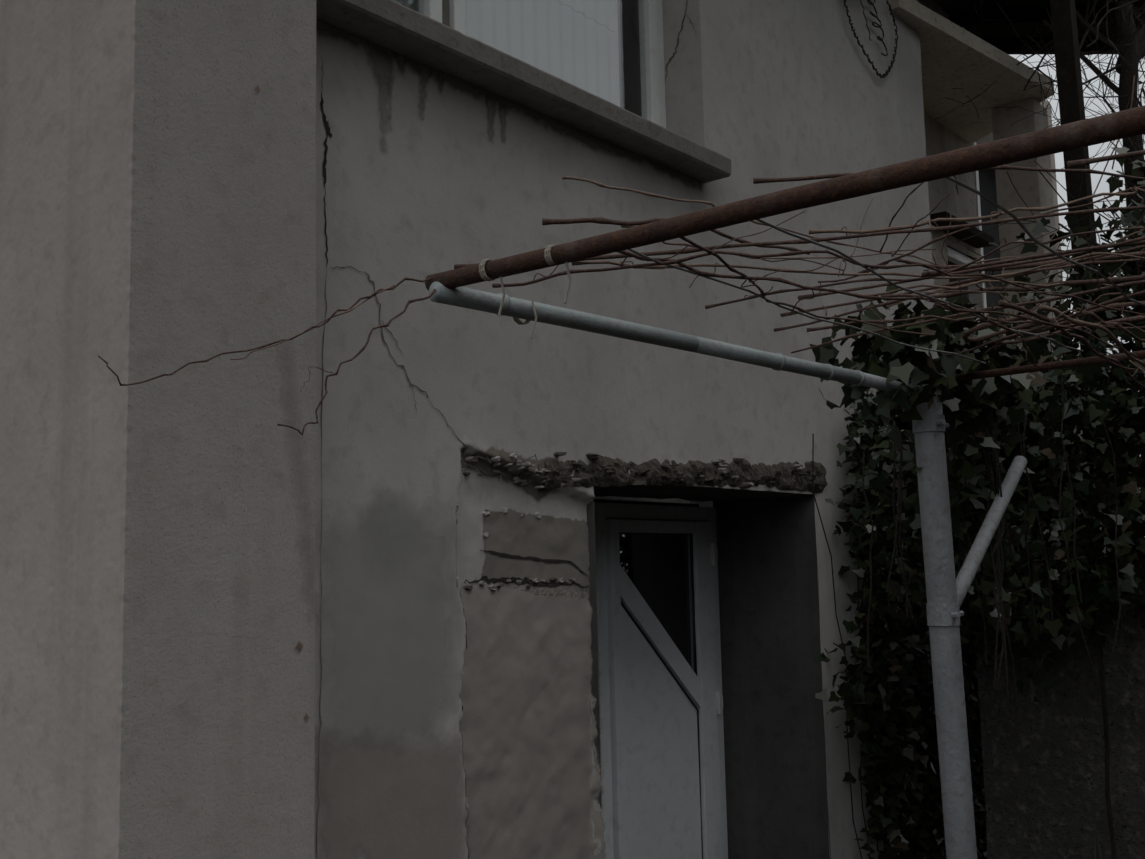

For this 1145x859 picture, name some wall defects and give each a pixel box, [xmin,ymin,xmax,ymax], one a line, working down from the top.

damp [316,18,701,189]
crack [316,57,470,856]
flaking render [456,446,828,859]